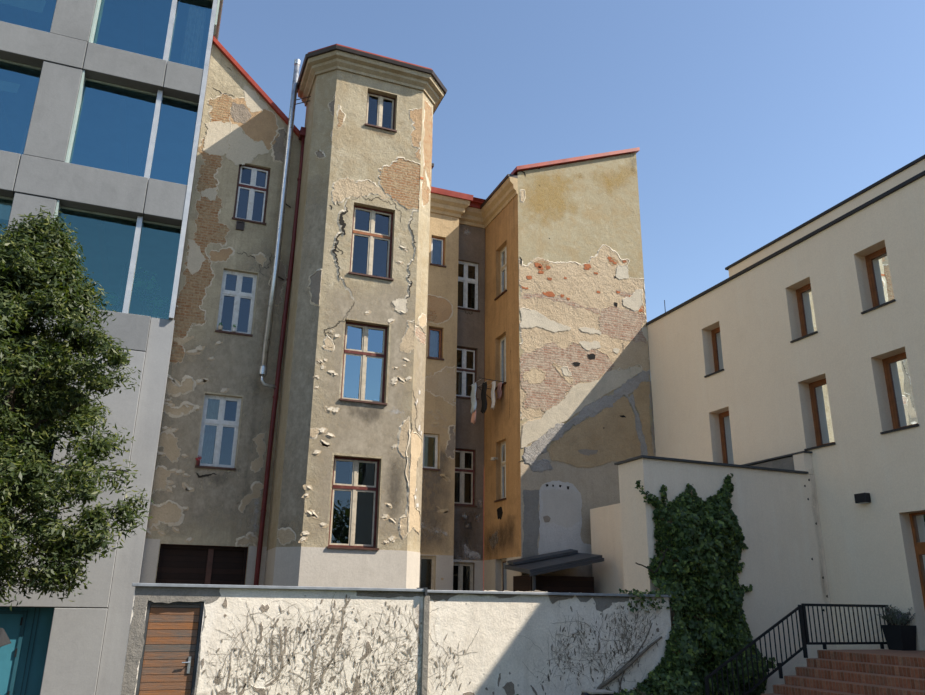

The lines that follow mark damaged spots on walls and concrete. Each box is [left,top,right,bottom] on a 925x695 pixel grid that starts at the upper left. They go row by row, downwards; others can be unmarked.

flaking render [331,100,433,212]
flaking render [146,86,287,543]
spalling [307,268,322,306]
peeling [313,330,341,389]
crack [323,180,424,349]
spalling [519,244,656,467]
peeling [310,427,335,456]
peeling [380,365,456,545]
flaking render [277,527,310,546]
peeling [305,509,329,528]